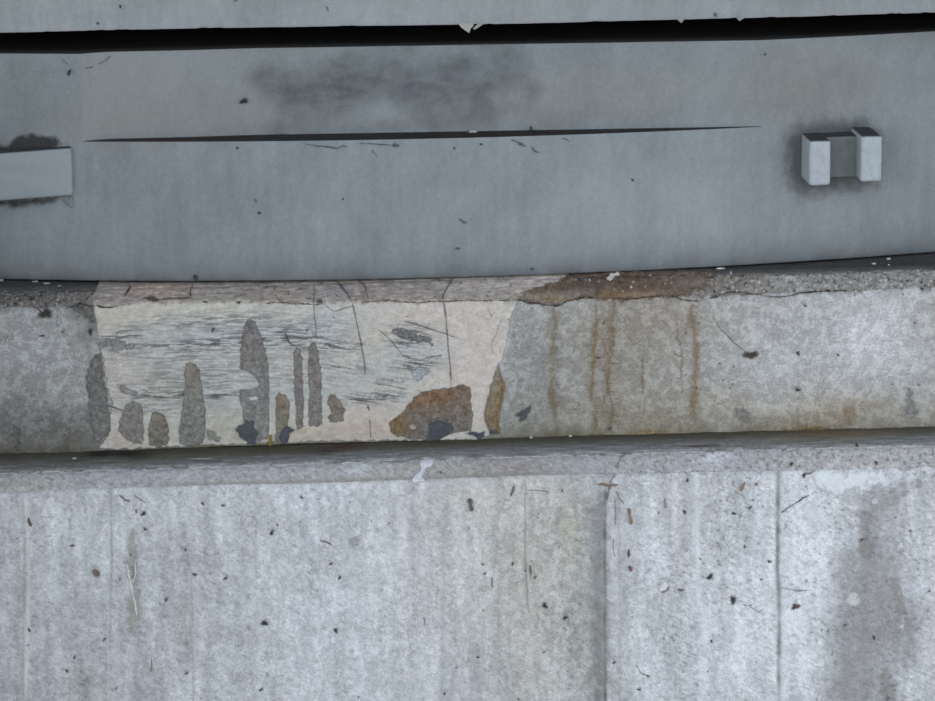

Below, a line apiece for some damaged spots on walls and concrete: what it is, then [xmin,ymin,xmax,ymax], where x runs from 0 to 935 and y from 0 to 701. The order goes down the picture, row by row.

rust [521,269,709,306]
peeling [92,273,569,450]
water stain [813,463,894,495]